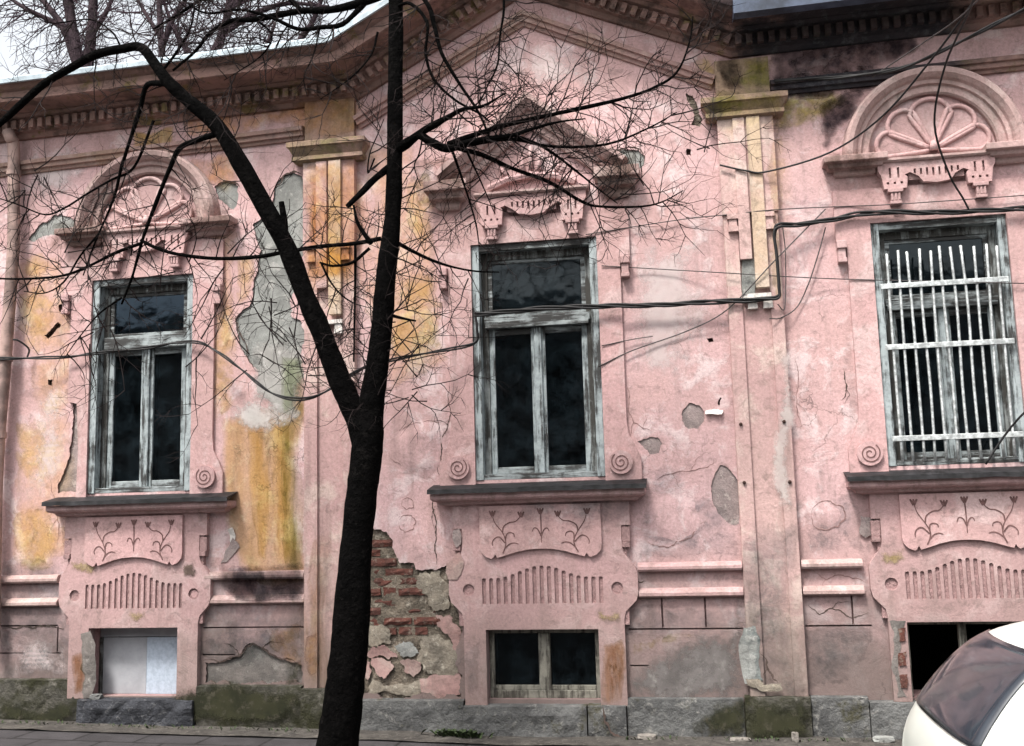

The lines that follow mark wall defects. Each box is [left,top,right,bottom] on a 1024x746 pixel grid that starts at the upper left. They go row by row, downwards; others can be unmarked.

spalling [273,172,303,256]
spalling [236,219,304,371]
spalling [58,403,78,493]
water stain [236,342,304,428]
spalling [638,437,662,455]
crack [656,453,714,493]
spalling [682,398,723,429]
spalling [711,465,740,526]
crack [398,497,437,563]
spalling [364,528,464,698]
crack [808,570,866,618]
spalling [738,626,782,692]